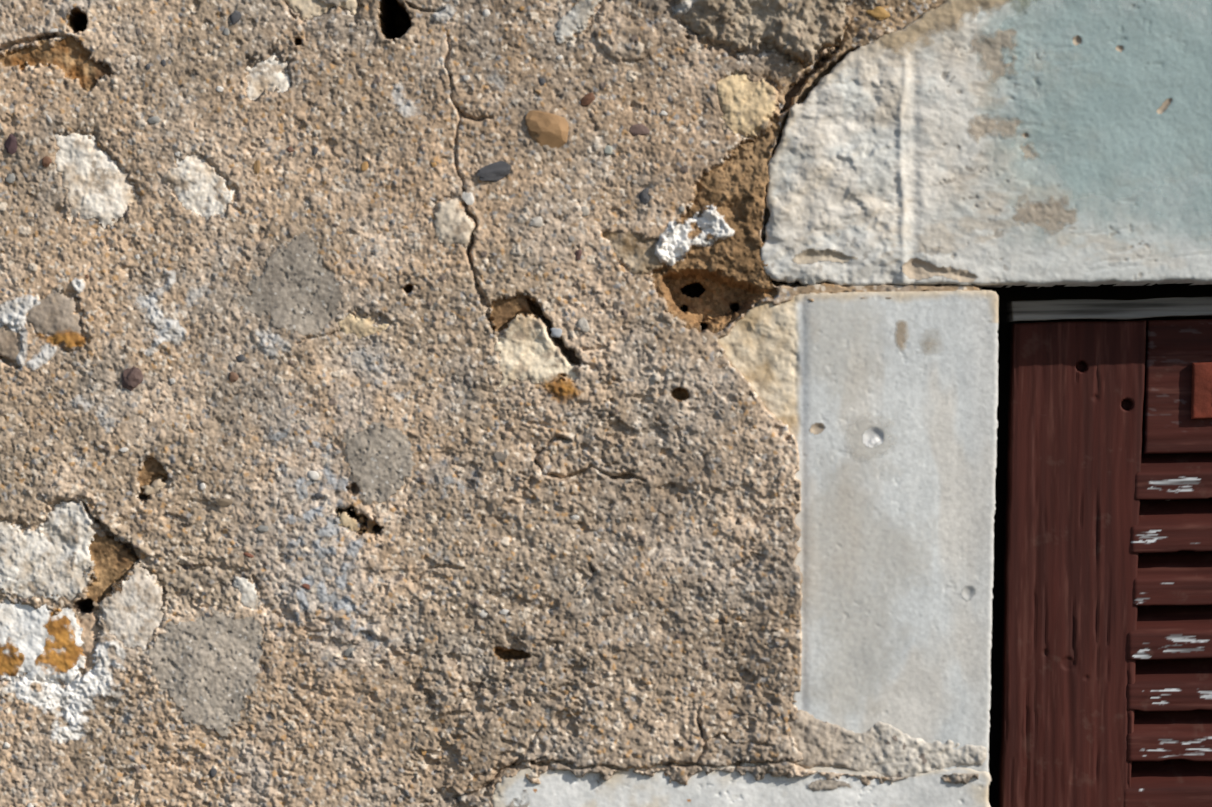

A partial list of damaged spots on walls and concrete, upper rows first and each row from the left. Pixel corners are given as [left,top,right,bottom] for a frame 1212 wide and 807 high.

flaking render [0,33,113,92]
peeling [972,30,1016,79]
crack [460,112,490,121]
flaking render [603,72,780,333]
peeling [1015,198,1076,230]
crack [467,233,475,263]
spalling [902,258,978,282]
flaking render [0,278,86,370]
flaking render [0,500,164,684]